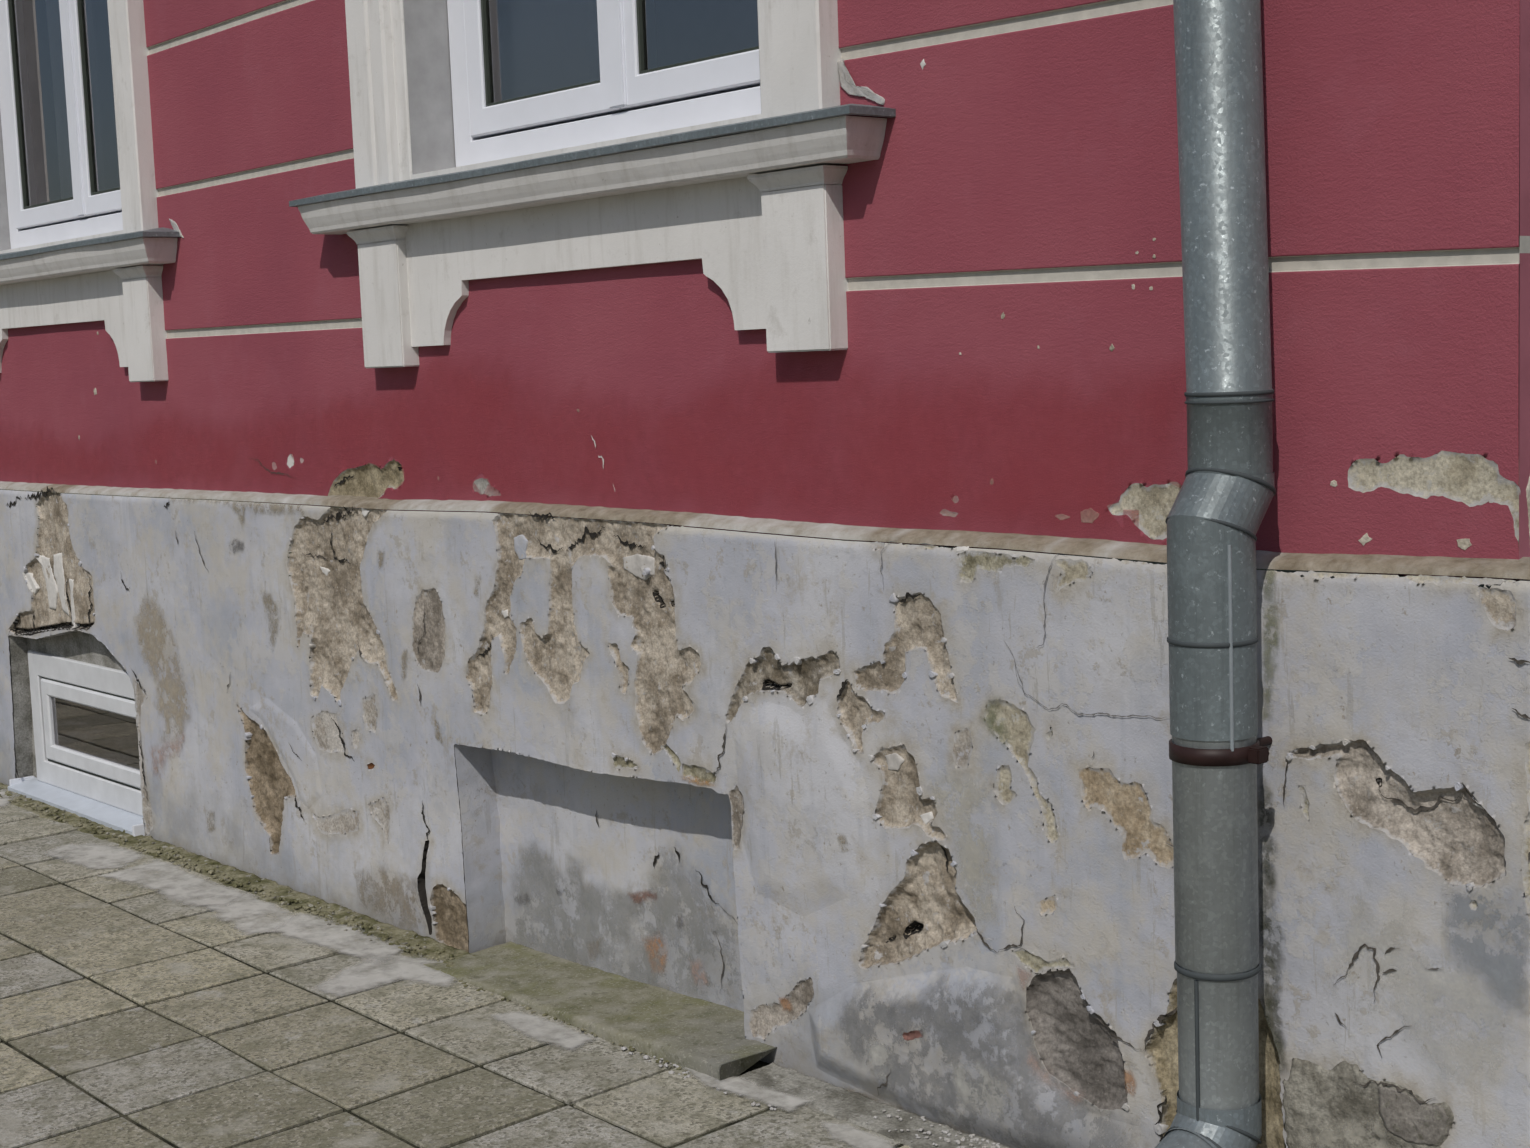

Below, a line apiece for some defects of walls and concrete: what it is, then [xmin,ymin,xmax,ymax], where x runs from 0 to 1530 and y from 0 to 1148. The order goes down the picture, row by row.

flaking render [7,486,95,636]
flaking render [287,459,404,761]
flaking render [466,478,744,850]
crack [1005,553,1161,719]
peeling [1330,451,1530,540]
crack [417,803,432,935]
flaking render [726,592,978,969]
flaking render [1285,739,1530,941]
flaking render [1011,948,1135,1112]
flaking render [1256,998,1454,1148]
crack [1334,943,1441,1026]
crack [1377,1026,1409,1057]